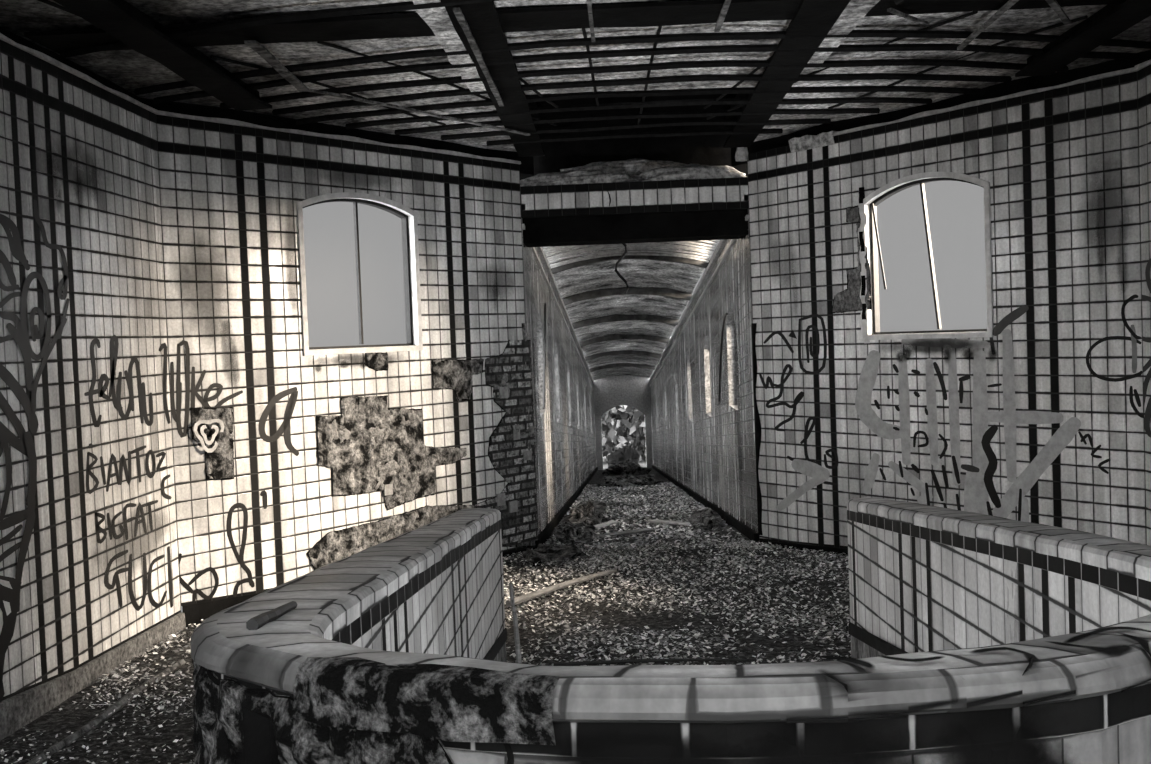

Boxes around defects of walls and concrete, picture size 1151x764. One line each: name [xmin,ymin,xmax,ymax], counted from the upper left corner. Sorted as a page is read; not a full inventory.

peeling [306,323,538,570]
spalling [191,657,560,764]